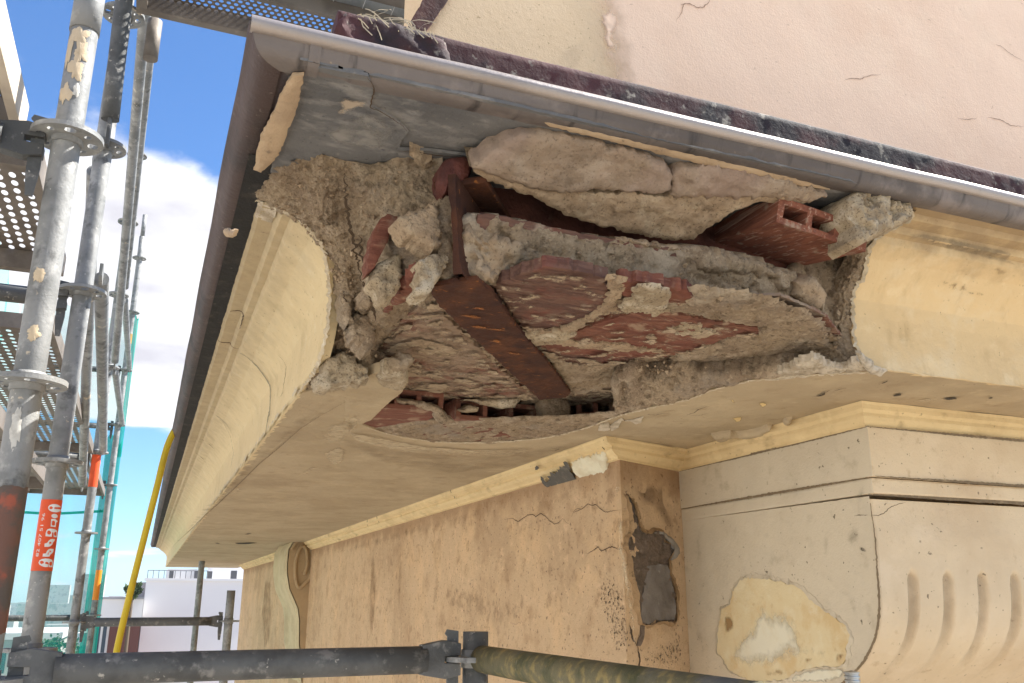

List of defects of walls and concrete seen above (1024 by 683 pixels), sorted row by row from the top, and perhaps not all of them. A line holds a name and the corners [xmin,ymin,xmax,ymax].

spalling [184,127,912,541]
crack [511,504,616,525]
flaking render [621,493,680,646]
peeling [714,572,854,683]